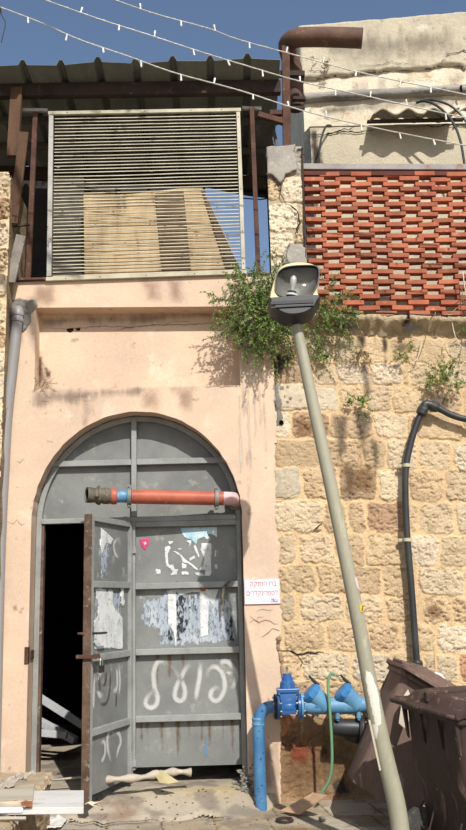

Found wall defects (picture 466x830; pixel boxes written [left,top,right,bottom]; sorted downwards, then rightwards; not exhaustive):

flaking render [266,144,297,183]
flaking render [282,243,307,266]
crack [53,321,229,330]
crack [250,609,320,668]
spalling [280,714,293,737]